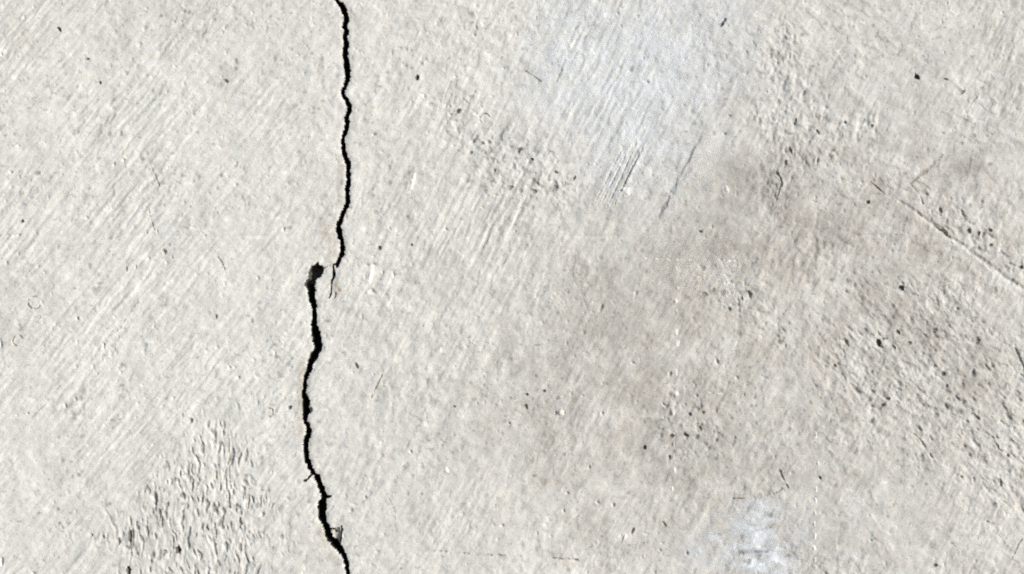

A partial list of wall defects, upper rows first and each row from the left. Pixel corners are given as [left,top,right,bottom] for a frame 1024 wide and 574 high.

crack [301,0,352,574]